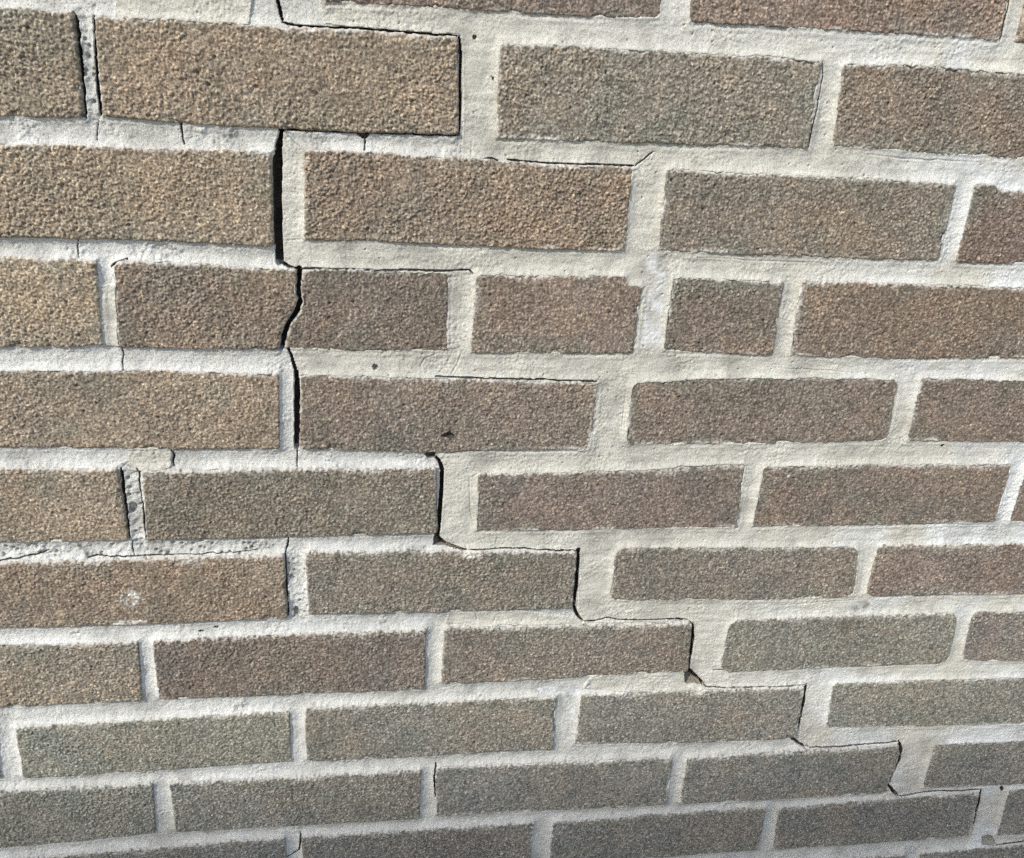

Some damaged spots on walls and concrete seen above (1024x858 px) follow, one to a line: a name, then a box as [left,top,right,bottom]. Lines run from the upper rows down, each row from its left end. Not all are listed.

crack [808,67,823,147]
crack [487,151,654,166]
crack [273,0,471,457]
crack [436,374,596,382]
crack [88,467,256,558]
crack [0,550,47,561]
crack [283,537,291,615]
crack [435,455,981,823]